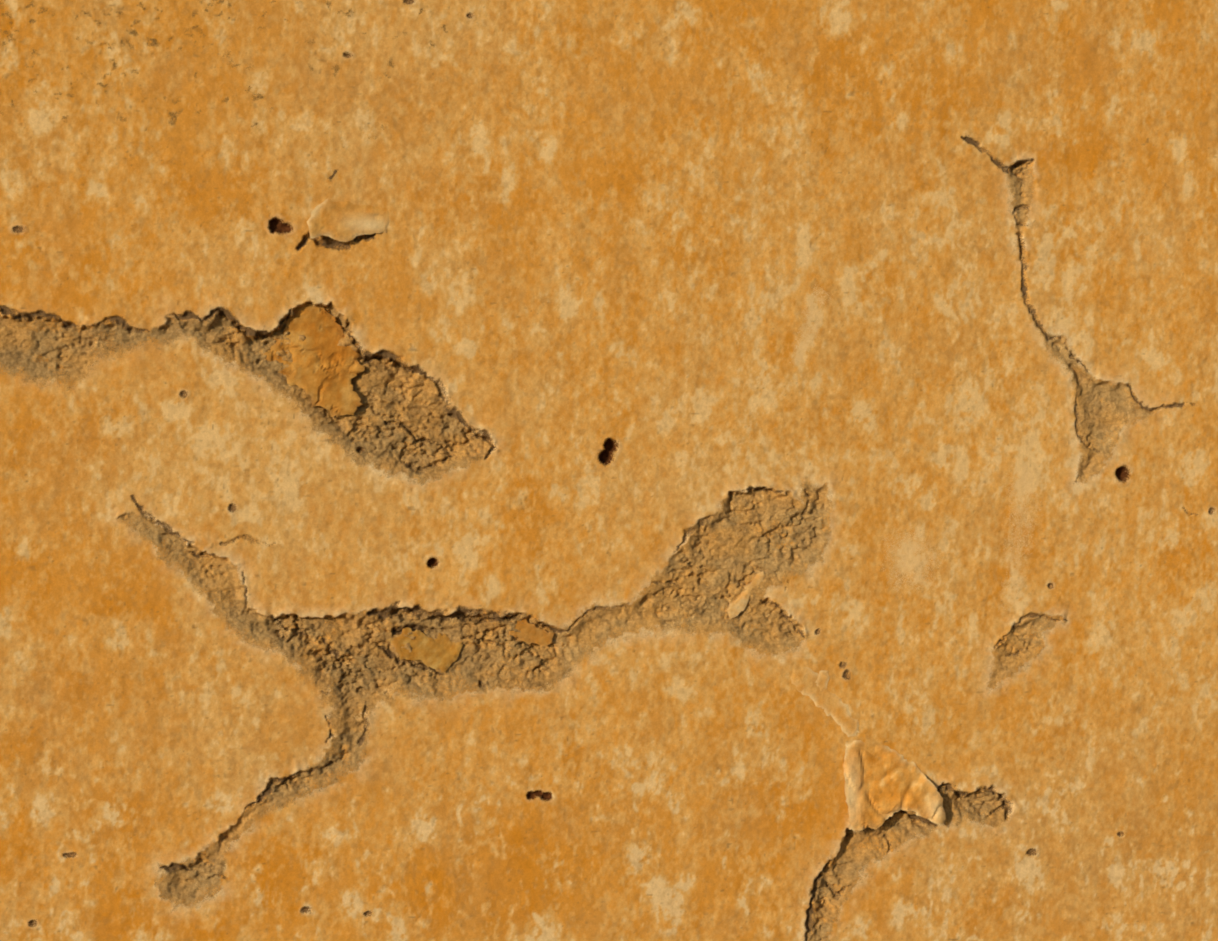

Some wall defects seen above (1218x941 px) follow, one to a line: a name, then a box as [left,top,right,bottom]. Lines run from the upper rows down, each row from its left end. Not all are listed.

spalling [0,301,497,486]
spalling [116,476,834,913]
spalling [986,611,1068,694]
spalling [803,740,1013,941]